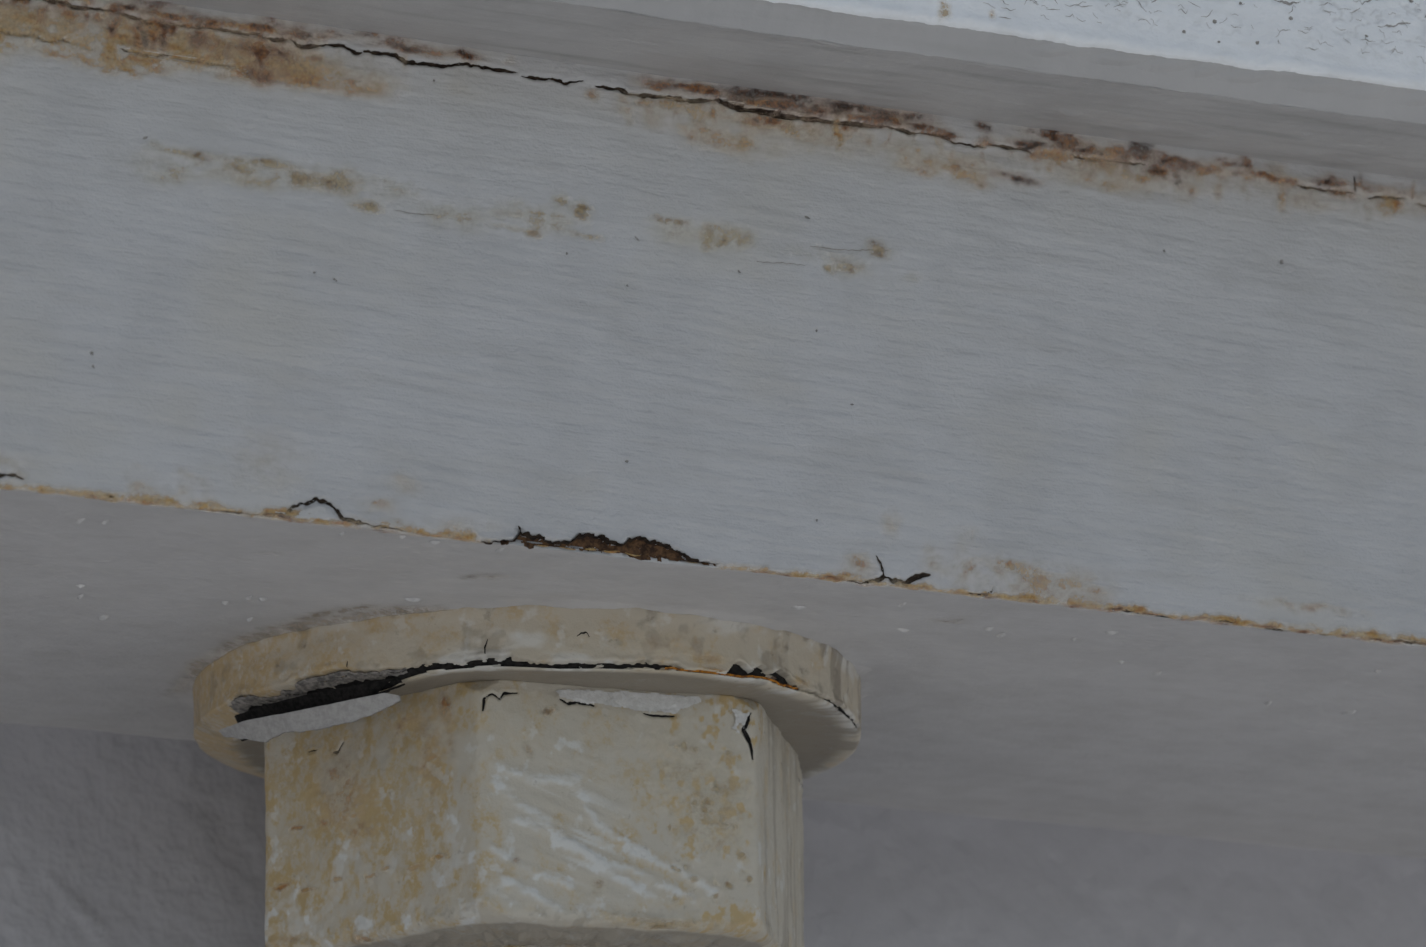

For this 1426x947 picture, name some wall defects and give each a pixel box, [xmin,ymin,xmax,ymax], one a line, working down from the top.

corrosion [0,0,335,87]
crack [5,0,1032,154]
corrosion [639,80,956,147]
corrosion [1015,129,1296,200]
corrosion [0,485,356,527]
crack [191,497,407,532]
spalling [481,526,716,566]
crack [847,555,931,585]
corrosion [723,559,1426,644]
peeling [219,693,401,742]
crack [229,632,857,741]
crack [742,713,754,760]